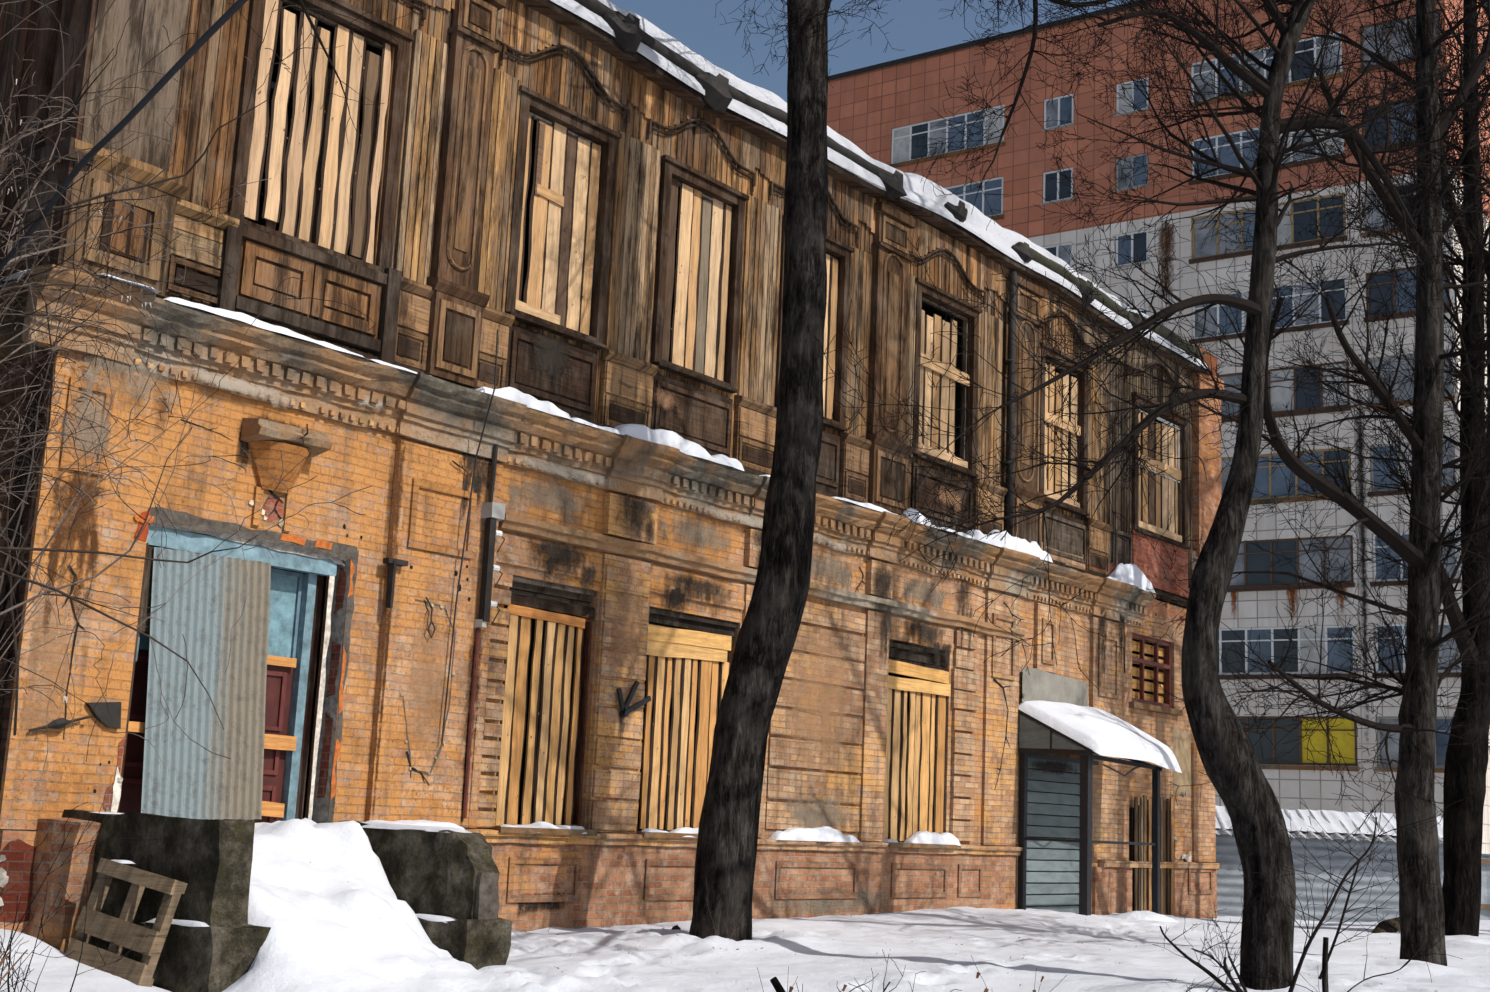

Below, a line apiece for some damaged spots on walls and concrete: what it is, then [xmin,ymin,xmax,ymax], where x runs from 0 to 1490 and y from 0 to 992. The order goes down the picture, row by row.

leakage [0,363,46,743]
leakage [45,471,100,623]
spalling [134,510,155,541]
flaking render [248,494,359,824]
leakage [532,540,595,589]
leakage [665,574,730,613]